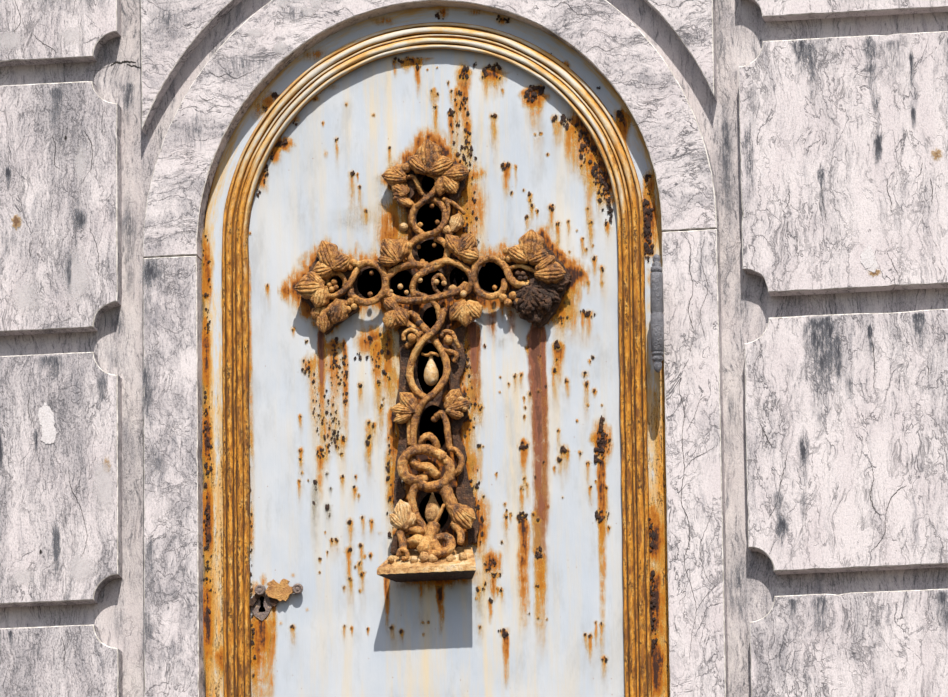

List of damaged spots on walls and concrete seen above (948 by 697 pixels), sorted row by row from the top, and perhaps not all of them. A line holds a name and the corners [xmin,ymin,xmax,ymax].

corrosion [393,57,438,84]
corrosion [521,85,549,135]
corrosion [611,109,631,143]
corrosion [642,173,658,262]
corrosion [281,62,530,638]
corrosion [499,110,615,651]
corrosion [202,235,224,672]
corrosion [649,504,667,697]
corrosion [251,606,295,697]
corrosion [498,628,509,679]